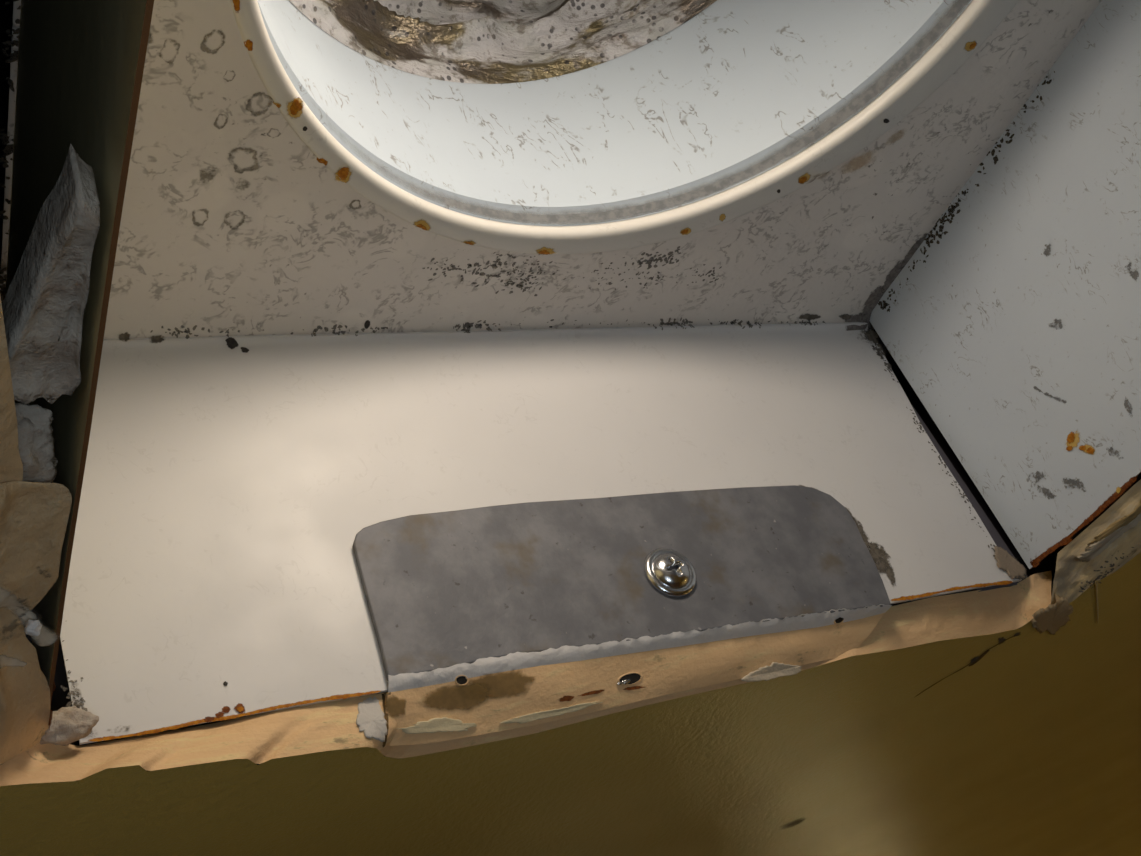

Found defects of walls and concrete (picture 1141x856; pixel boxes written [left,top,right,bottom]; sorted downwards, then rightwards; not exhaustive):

leakage [201,30,225,54]
corrosion [273,97,303,118]
leakage [229,147,259,187]
corrosion [317,157,351,183]
leakage [422,252,566,296]
leakage [583,246,722,290]
corrosion [1066,431,1095,454]
peeling [1038,478,1085,499]
peeling [1075,499,1141,562]
leakage [61,659,87,711]
crack [915,635,1017,697]
corrosion [88,691,380,742]